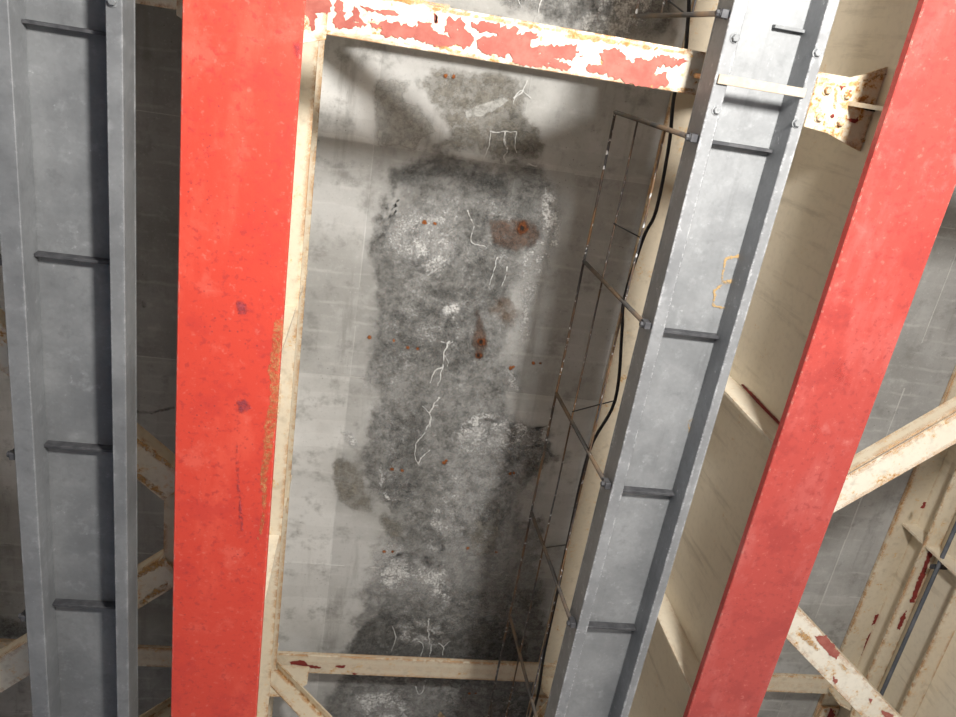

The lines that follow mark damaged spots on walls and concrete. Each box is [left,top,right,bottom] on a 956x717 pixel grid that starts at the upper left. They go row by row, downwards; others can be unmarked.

damp [507,0,672,37]
peeling [305,0,687,89]
crack [513,80,531,104]
rust [816,74,886,115]
crack [483,131,537,167]
crack [467,210,508,285]
rust [490,220,539,250]
rust [473,312,487,359]
damp [334,71,560,662]
crack [414,341,452,464]
peeling [815,635,840,659]
damp [328,674,534,717]